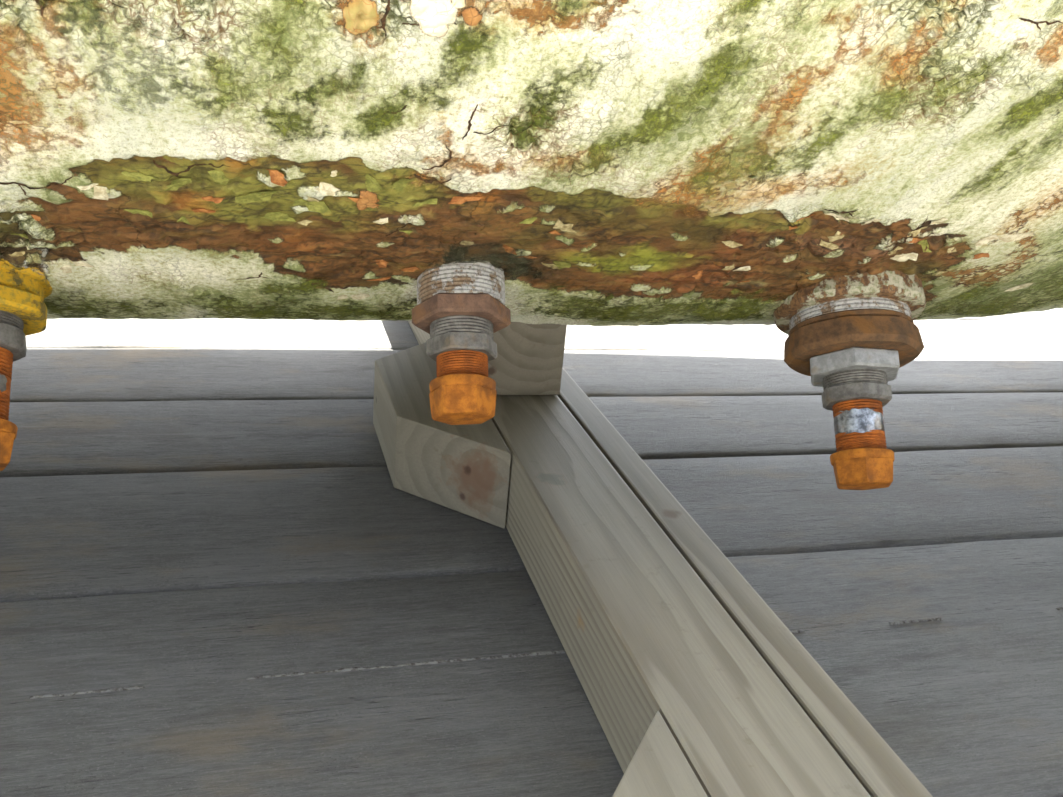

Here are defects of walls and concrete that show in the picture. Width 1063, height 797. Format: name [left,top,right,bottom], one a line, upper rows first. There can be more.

crack [35,0,45,17]
rust [0,0,95,164]
leakage [81,0,255,115]
crack [152,159,230,178]
leakage [262,62,366,142]
crack [378,0,419,38]
leakage [572,109,675,177]
rust [634,5,942,215]
crack [1019,18,1062,31]
rust [1020,26,1063,66]
peeling [0,155,1035,302]
leakage [44,292,177,319]